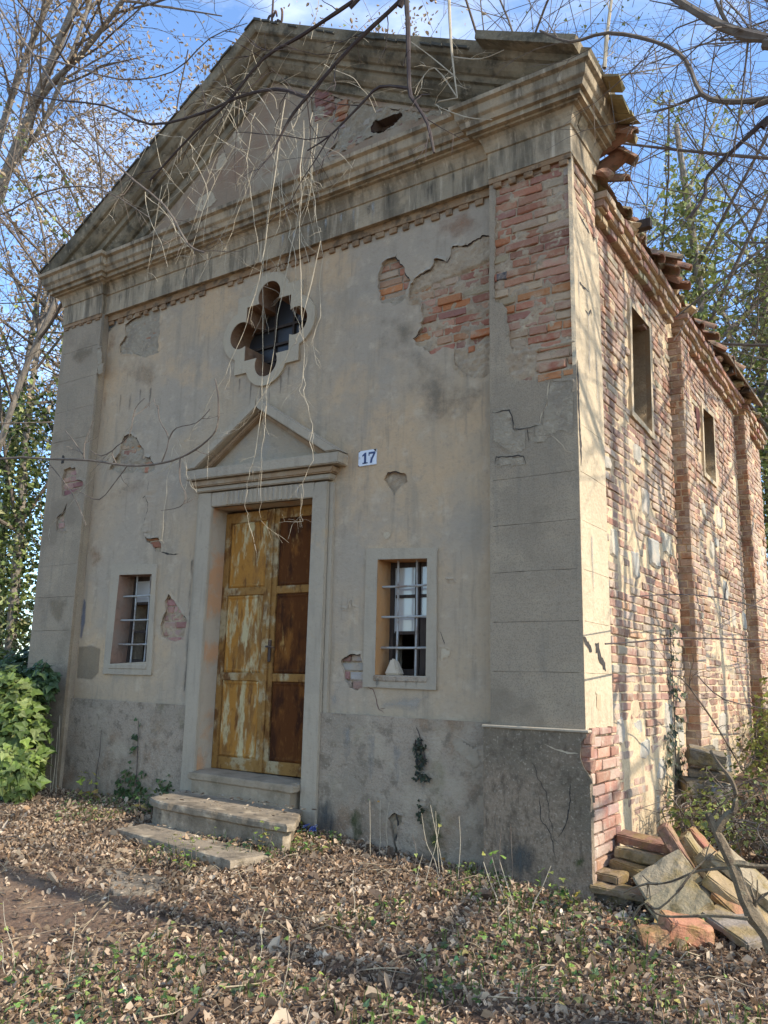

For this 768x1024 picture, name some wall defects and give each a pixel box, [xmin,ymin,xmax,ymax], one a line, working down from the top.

spalling [312,90,446,158]
spalling [375,163,597,383]
spalling [118,309,163,358]
crack [492,360,582,463]
spalling [108,431,155,474]
spalling [386,471,407,493]
spalling [159,591,187,642]
spalling [343,650,363,690]
crack [532,744,578,862]